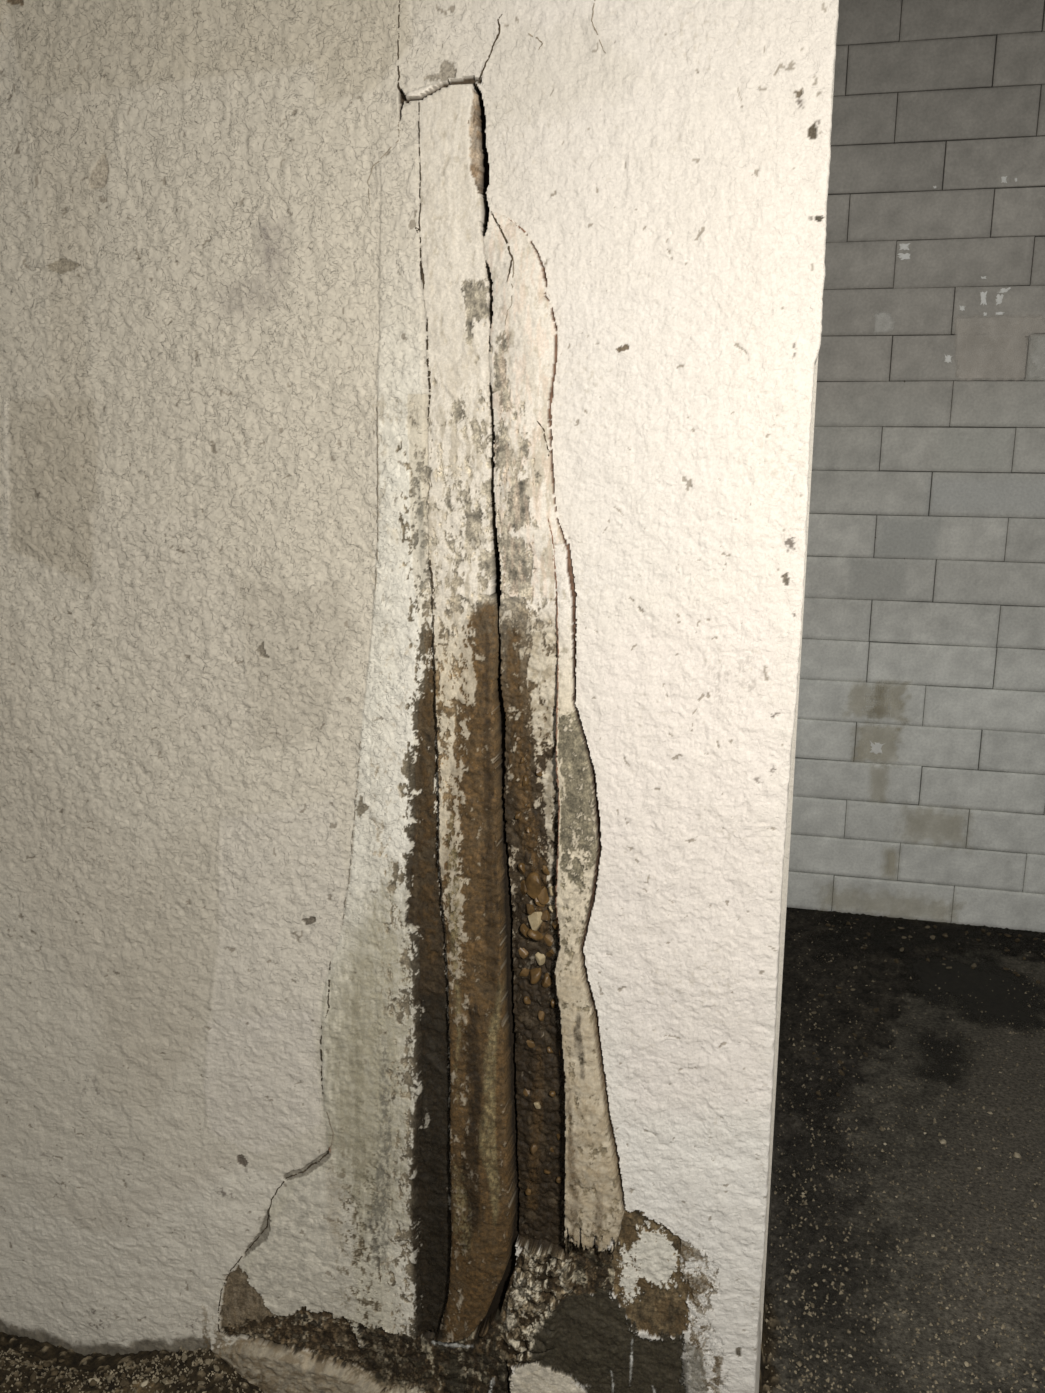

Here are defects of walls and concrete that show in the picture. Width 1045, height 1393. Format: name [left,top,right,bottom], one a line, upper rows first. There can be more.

crack [218,961,334,1333]
damp [224,603,707,1393]
flaking render [221,59,742,1393]
crack [472,651,520,1335]
crack [367,0,626,1209]